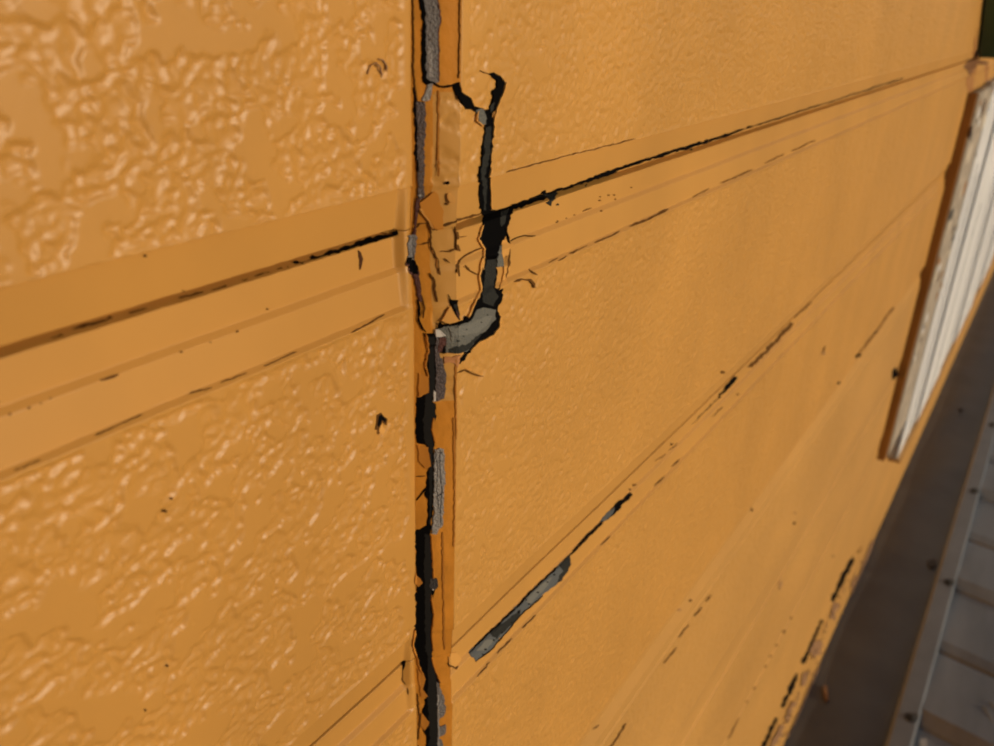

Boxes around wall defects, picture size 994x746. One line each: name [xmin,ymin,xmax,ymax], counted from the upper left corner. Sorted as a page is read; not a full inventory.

spalling [417,6,473,402]
crack [287,0,903,383]
peeling [417,446,431,469]
crack [415,451,444,526]
peeling [469,545,578,677]
crack [414,694,422,746]